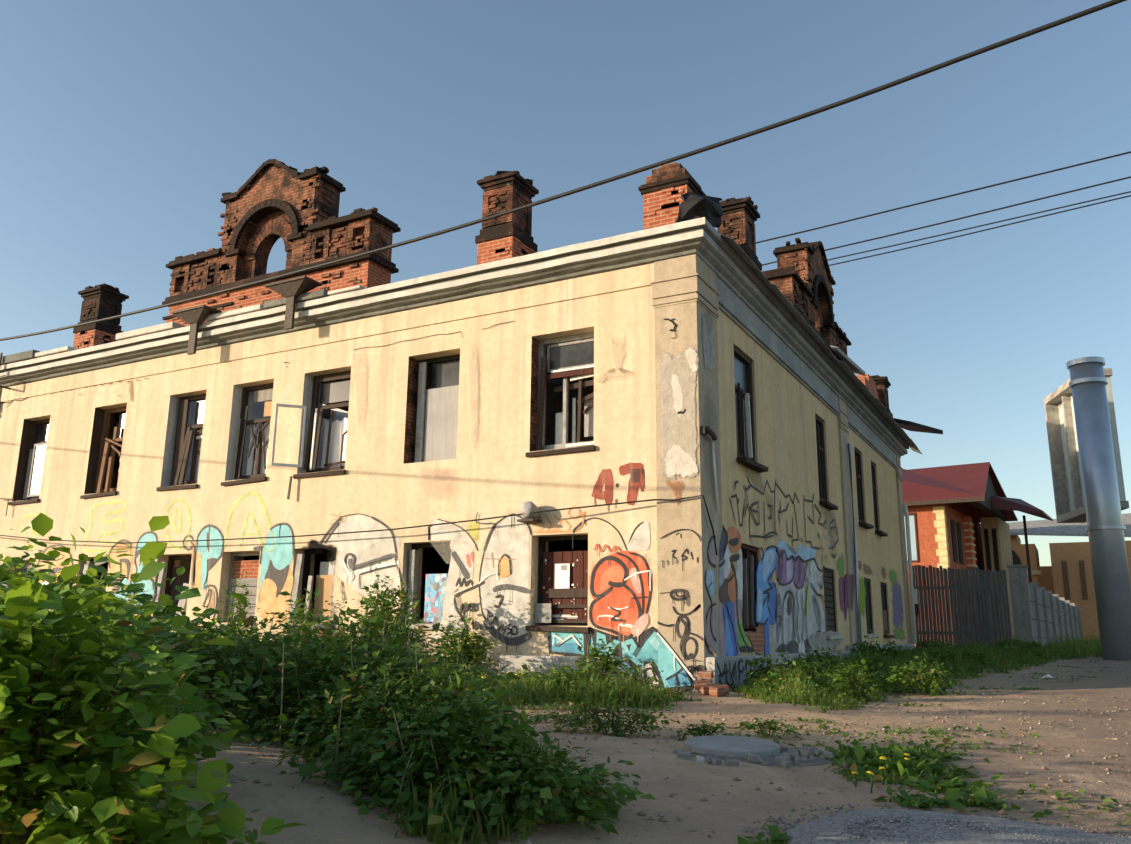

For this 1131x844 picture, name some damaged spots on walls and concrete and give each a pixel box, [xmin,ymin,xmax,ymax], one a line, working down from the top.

peeling [658,314,715,481]